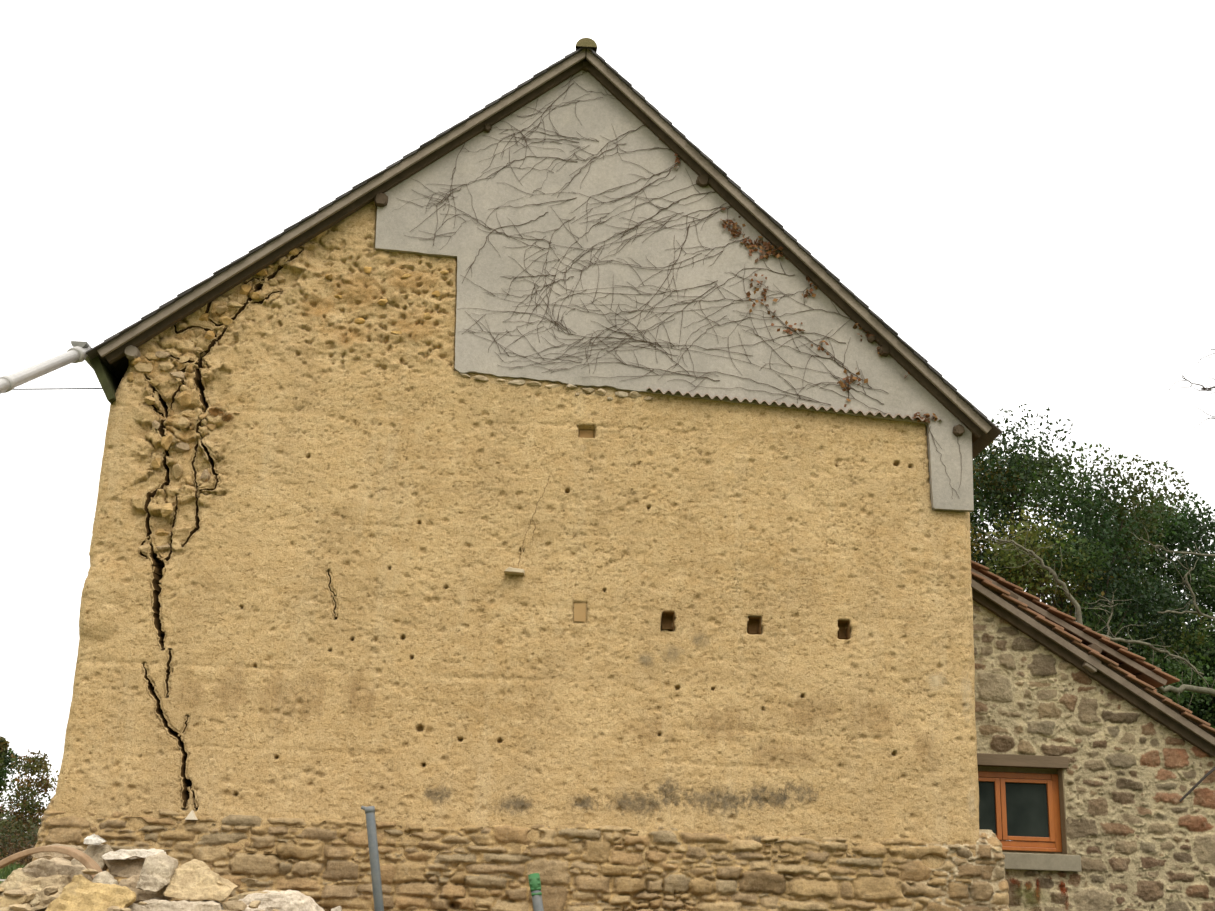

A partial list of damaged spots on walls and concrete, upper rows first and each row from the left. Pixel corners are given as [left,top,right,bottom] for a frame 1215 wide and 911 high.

crack [138,249,303,810]
crack [326,571,338,619]
water stain [688,788,813,808]